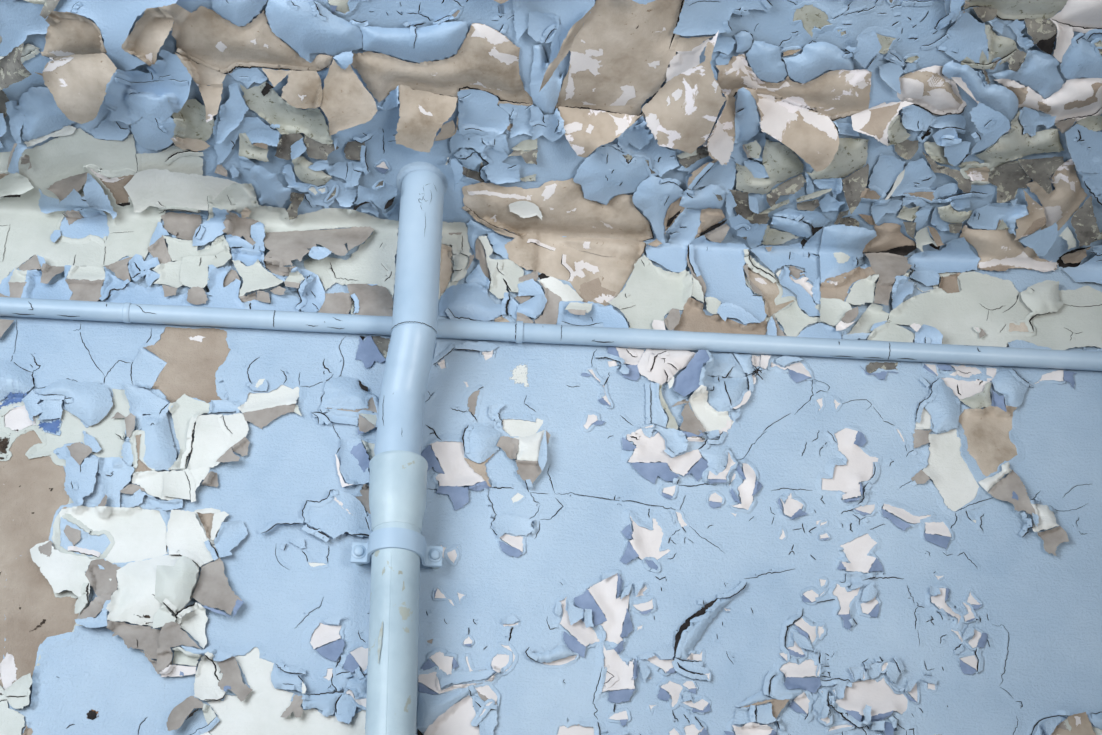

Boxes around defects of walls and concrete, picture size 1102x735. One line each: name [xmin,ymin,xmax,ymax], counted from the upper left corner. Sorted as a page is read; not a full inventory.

peeling [0,50,400,314]
peeling [435,0,1102,350]
peeling [0,324,379,735]
peeling [421,380,550,511]
crack [566,340,625,387]
crack [593,667,616,735]
crack [484,464,728,591]
peeling [533,346,763,735]
crack [650,342,944,680]
peeling [724,359,1025,735]
crack [749,572,1102,735]
crack [925,497,996,574]